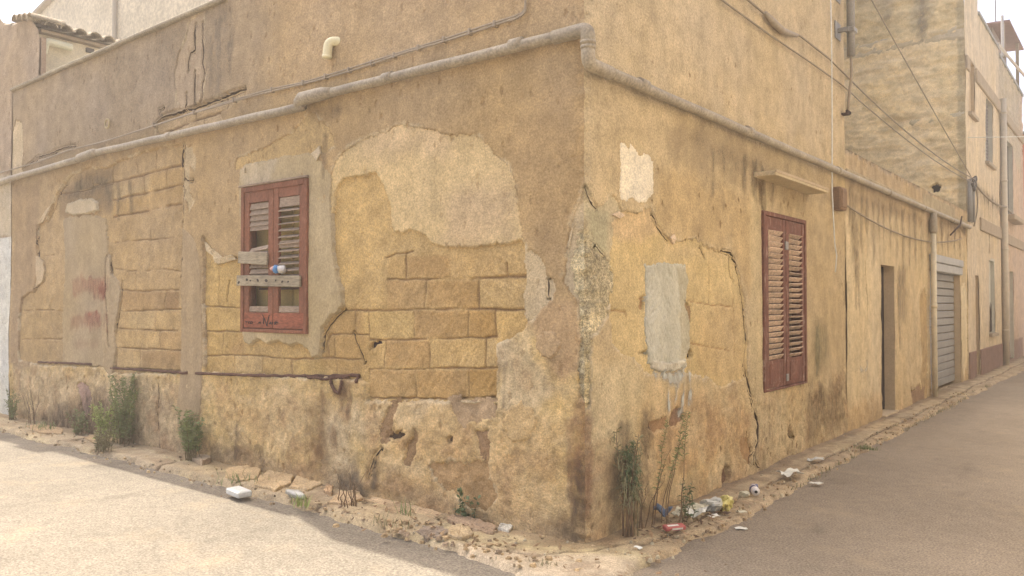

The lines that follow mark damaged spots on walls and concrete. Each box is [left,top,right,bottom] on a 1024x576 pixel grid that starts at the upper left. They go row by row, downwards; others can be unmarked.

flaking render [20,145,195,374]
crack [156,23,247,284]
flaking render [204,125,749,511]
crack [584,186,597,211]
crack [650,214,667,244]
crack [699,248,760,469]